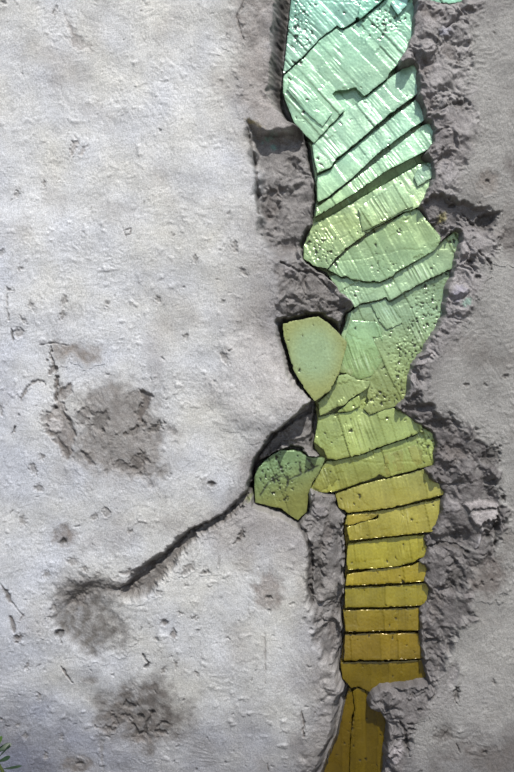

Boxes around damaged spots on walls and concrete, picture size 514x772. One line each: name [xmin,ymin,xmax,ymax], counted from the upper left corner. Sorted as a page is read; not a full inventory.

spalling [219,0,354,336]
water stain [39,567,141,666]
crack [60,456,320,606]
spalling [245,409,320,488]
spalling [289,488,346,772]
spalling [393,0,511,679]